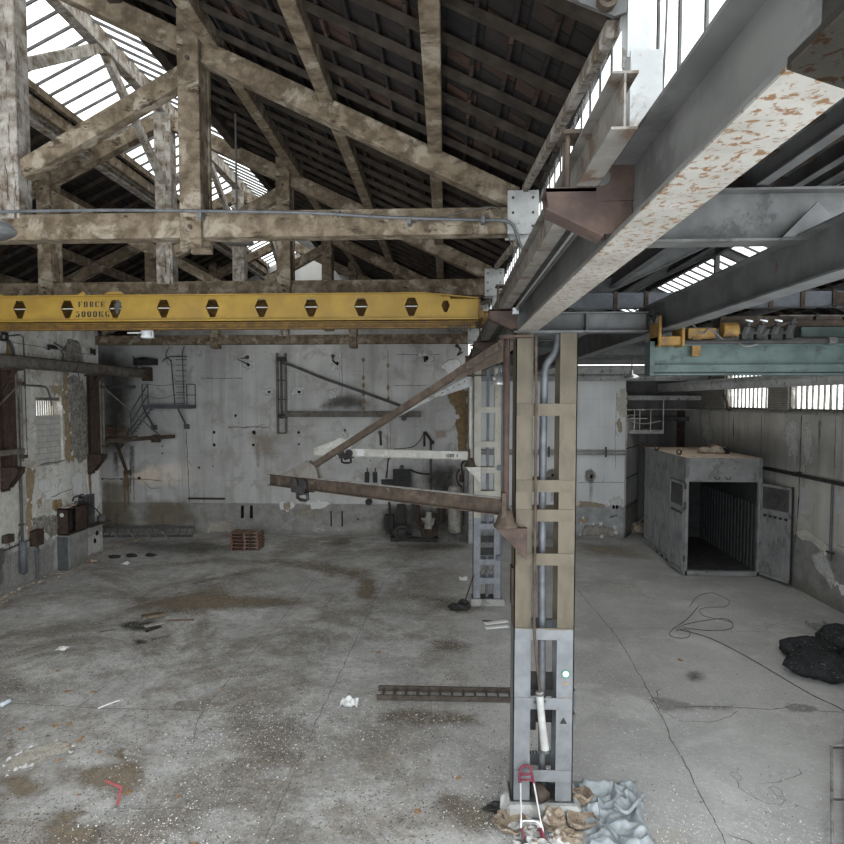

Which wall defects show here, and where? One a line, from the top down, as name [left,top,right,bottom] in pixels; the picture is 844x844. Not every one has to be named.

flaking render [61,338,84,362]
flaking render [49,372,88,463]
flaking render [447,390,468,451]
flaking render [577,495,624,538]
crack [617,683,835,722]
crack [731,769,809,810]